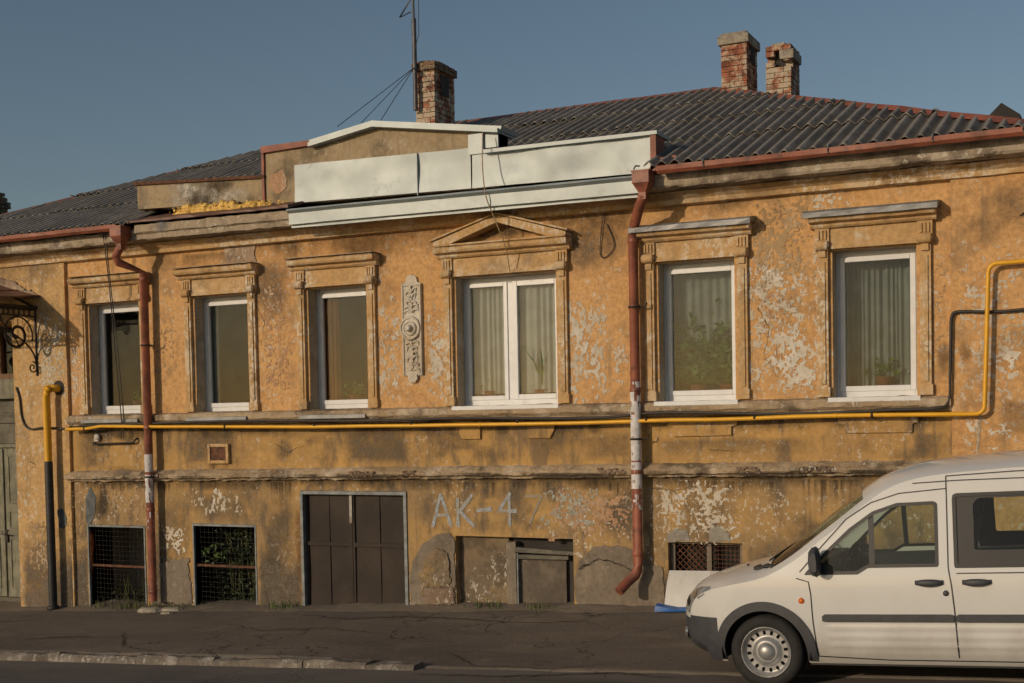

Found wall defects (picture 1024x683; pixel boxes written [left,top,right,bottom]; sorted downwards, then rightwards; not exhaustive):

spalling [268,170,287,194]
peeling [748,190,854,399]
peeling [377,295,401,407]
peeling [425,303,445,398]
peeling [568,292,630,404]
peeling [931,241,1024,452]
peeling [159,524,188,555]
peeling [183,487,258,516]
peeling [650,466,760,545]